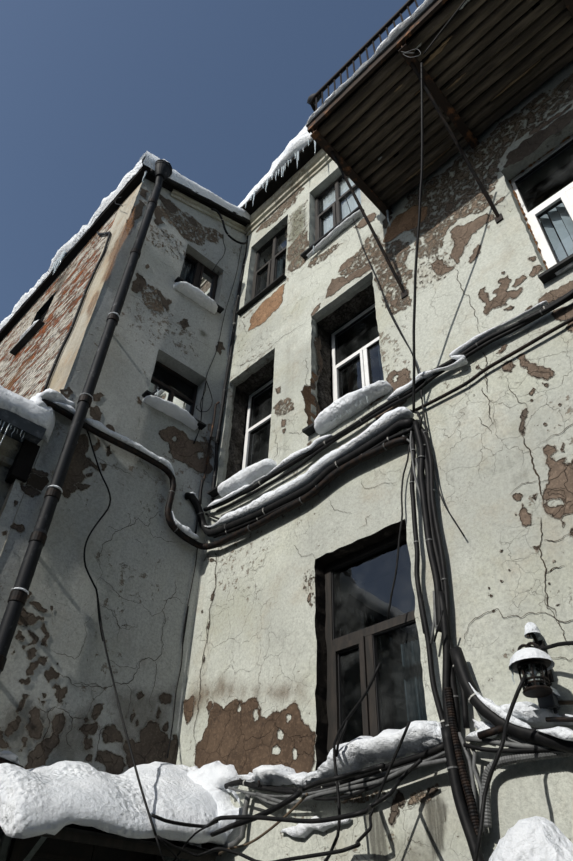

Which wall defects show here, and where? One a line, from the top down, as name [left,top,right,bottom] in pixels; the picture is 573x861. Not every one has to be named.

flaking render [126,188,148,235]
flaking render [311,73,573,316]
crack [422,197,494,433]
flaking render [478,256,573,332]
flaking render [496,344,555,435]
crack [464,424,573,661]
flaking render [512,442,573,537]
flaking render [0,591,68,770]
crack [40,511,180,765]
flaking render [78,691,179,775]
crack [193,550,217,763]
flaking render [194,696,317,779]